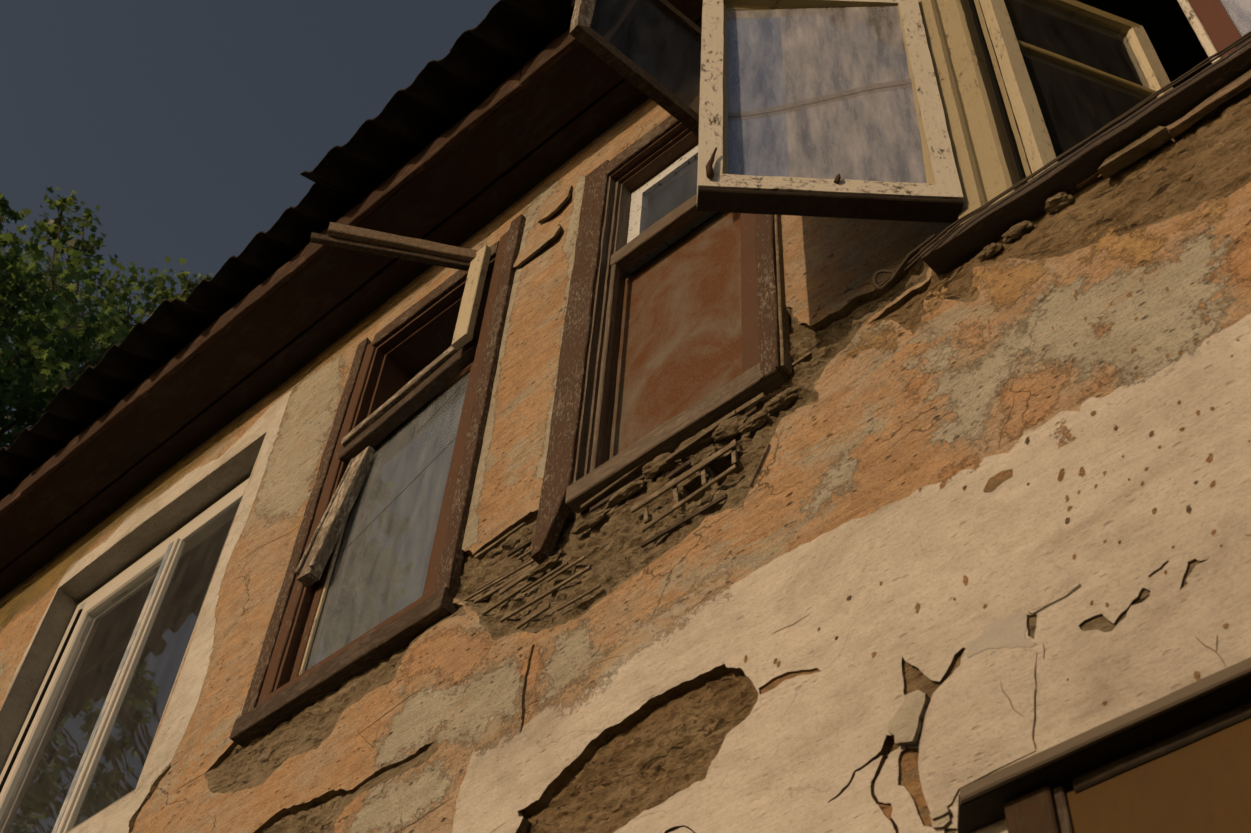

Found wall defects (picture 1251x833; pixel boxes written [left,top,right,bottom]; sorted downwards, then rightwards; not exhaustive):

flaking render [204,86,1251,833]
crack [520,645,534,732]
crack [901,648,966,711]
crack [828,735,899,833]
crack [664,825,696,833]